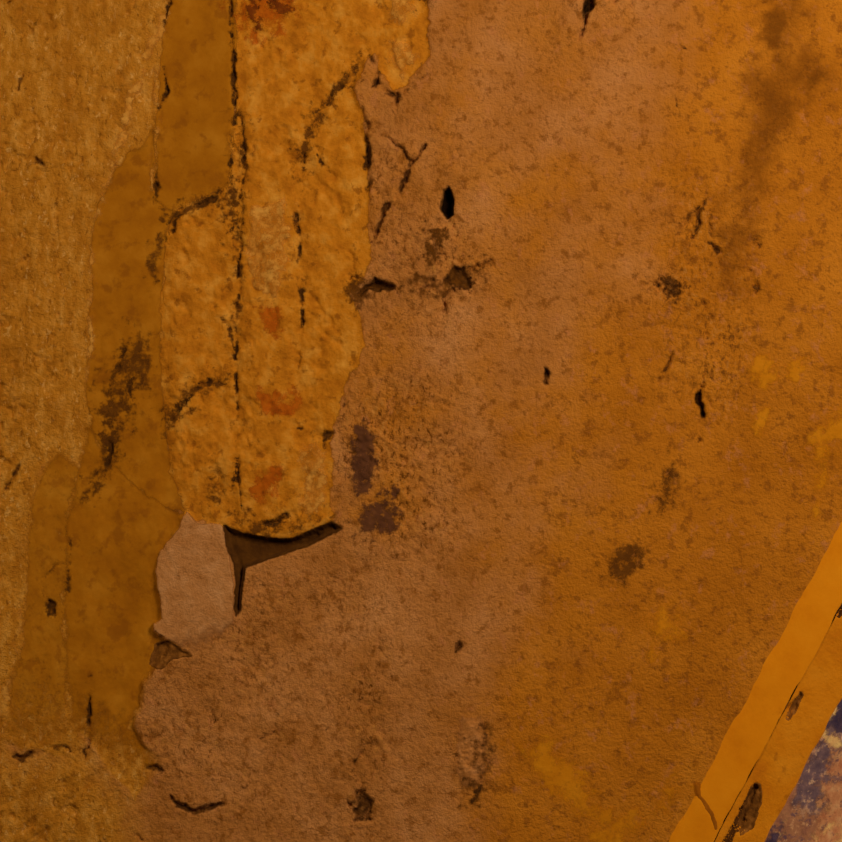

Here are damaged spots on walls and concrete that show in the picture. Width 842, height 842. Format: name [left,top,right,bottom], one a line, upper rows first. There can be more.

corrosion [239,0,295,44]
crack [166,0,247,233]
crack [363,120,372,191]
crack [370,143,425,243]
flaking render [440,187,454,219]
crack [175,222,244,412]
flaking render [426,261,491,309]
flaking render [46,0,431,765]
damp [348,419,402,542]
damp [602,544,645,584]
flaking render [349,792,372,821]
crack [693,782,762,842]